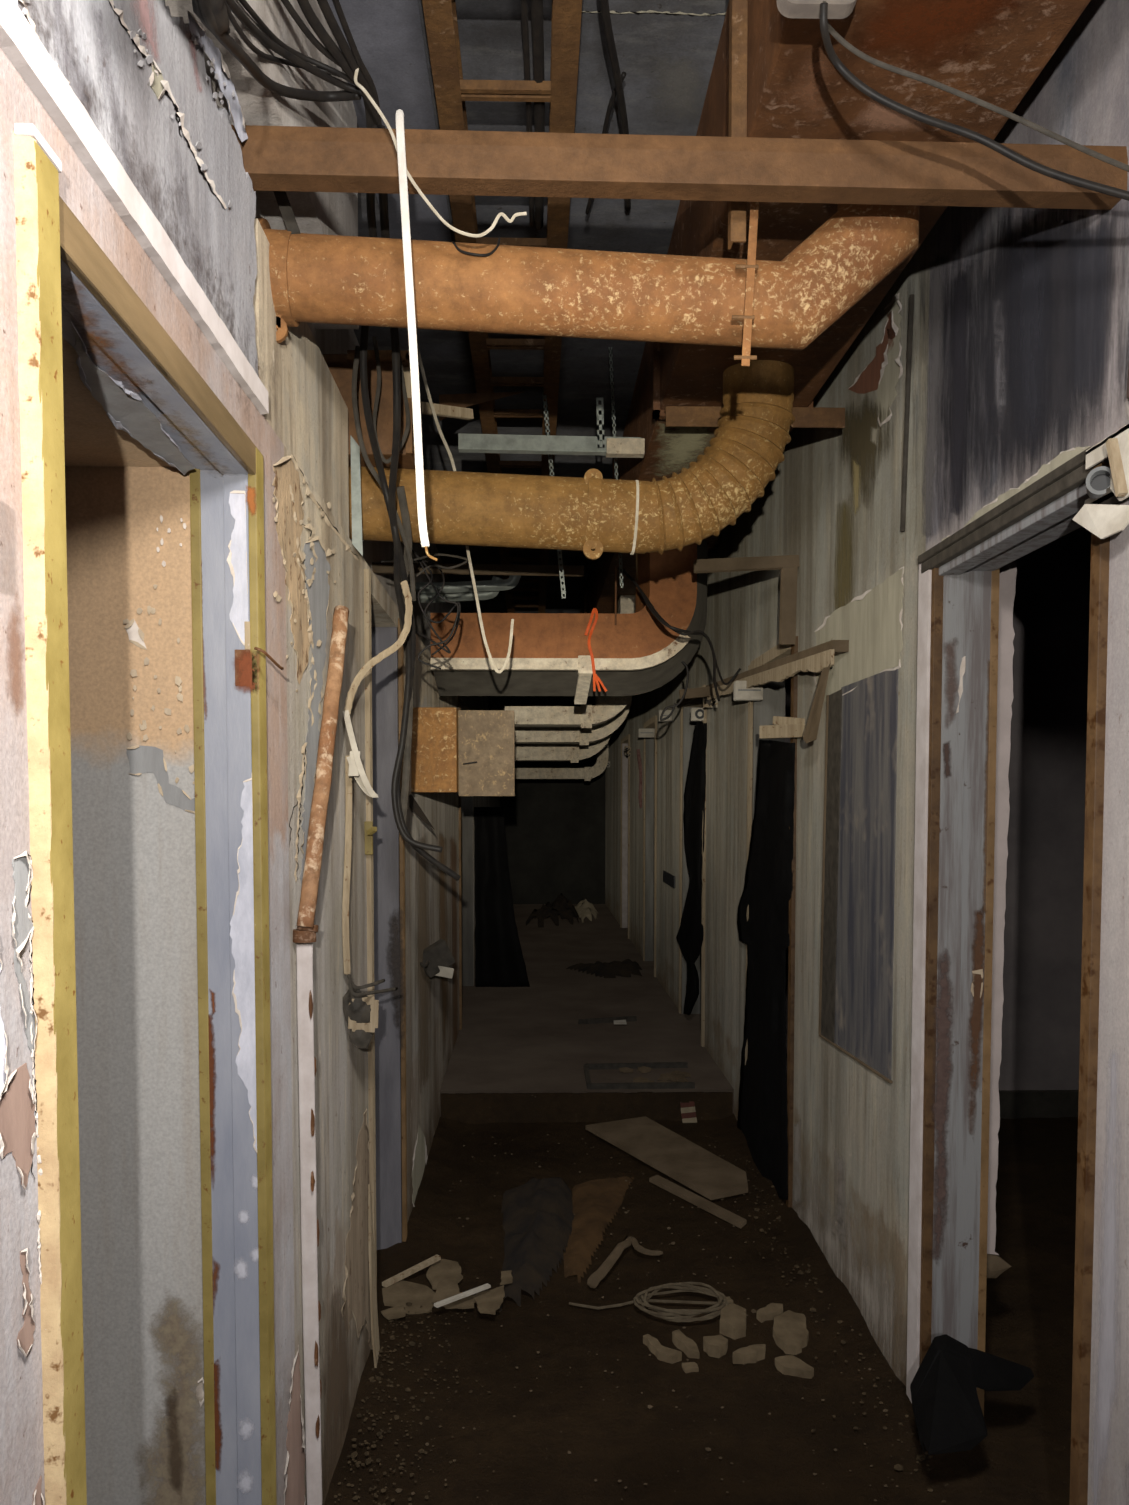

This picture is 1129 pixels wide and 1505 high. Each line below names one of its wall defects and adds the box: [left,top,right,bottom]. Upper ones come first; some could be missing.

peeling [848,293,903,427]
peeling [227,490,248,646]
peeling [272,455,336,884]
peeling [0,851,37,1190]
peeling [230,773,257,1153]
peeling [17,1248,35,1357]
peeling [32,1475,45,1505]
damp [144,1300,206,1505]